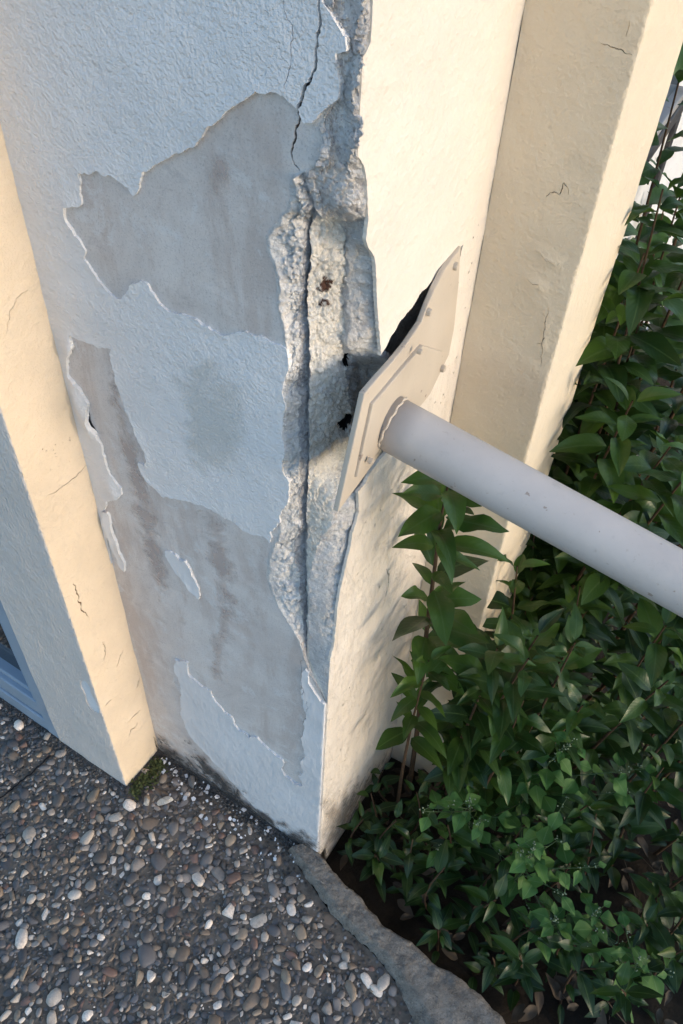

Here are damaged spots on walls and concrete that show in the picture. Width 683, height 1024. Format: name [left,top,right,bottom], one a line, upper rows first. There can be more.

peeling [66,0,435,853]
crack [292,31,326,702]
rust [315,276,333,306]
leakage [154,738,377,848]